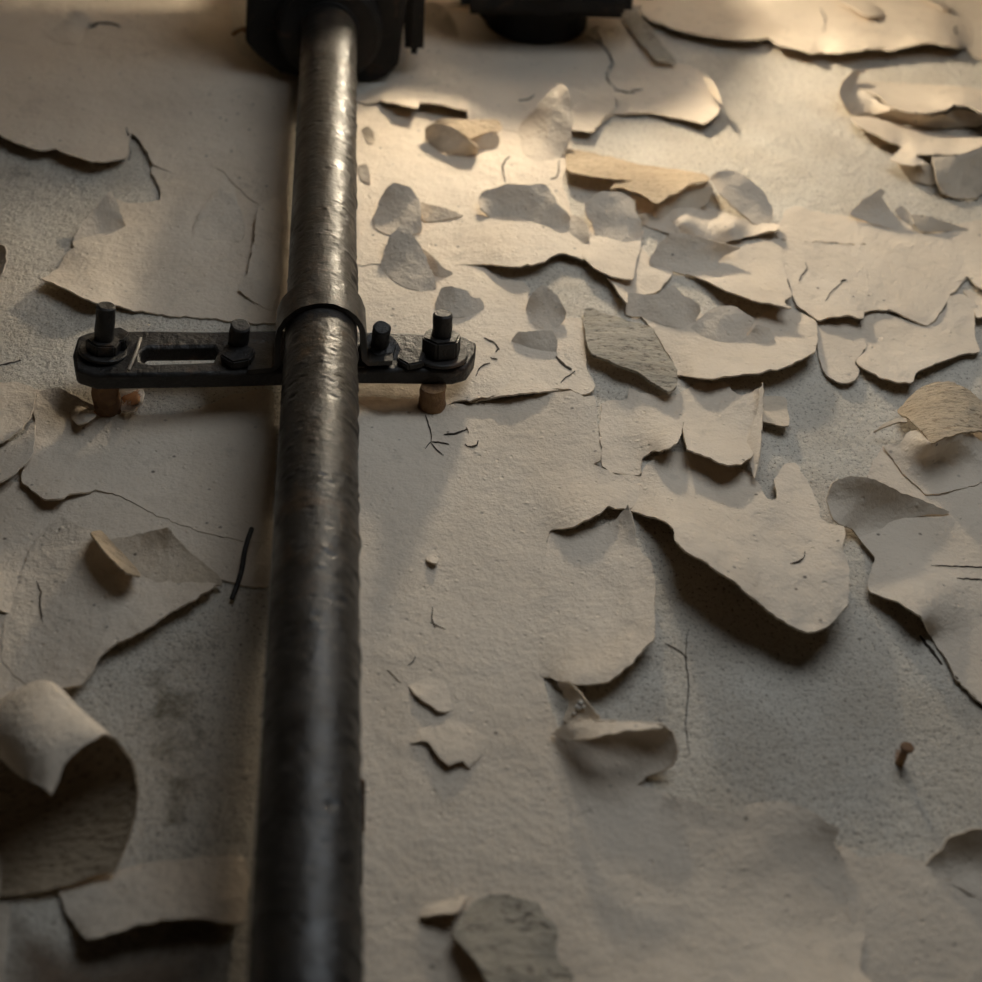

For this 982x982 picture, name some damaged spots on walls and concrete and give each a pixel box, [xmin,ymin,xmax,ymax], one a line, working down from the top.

peeling [0,0,291,325]
peeling [0,381,276,982]
peeling [356,0,982,982]